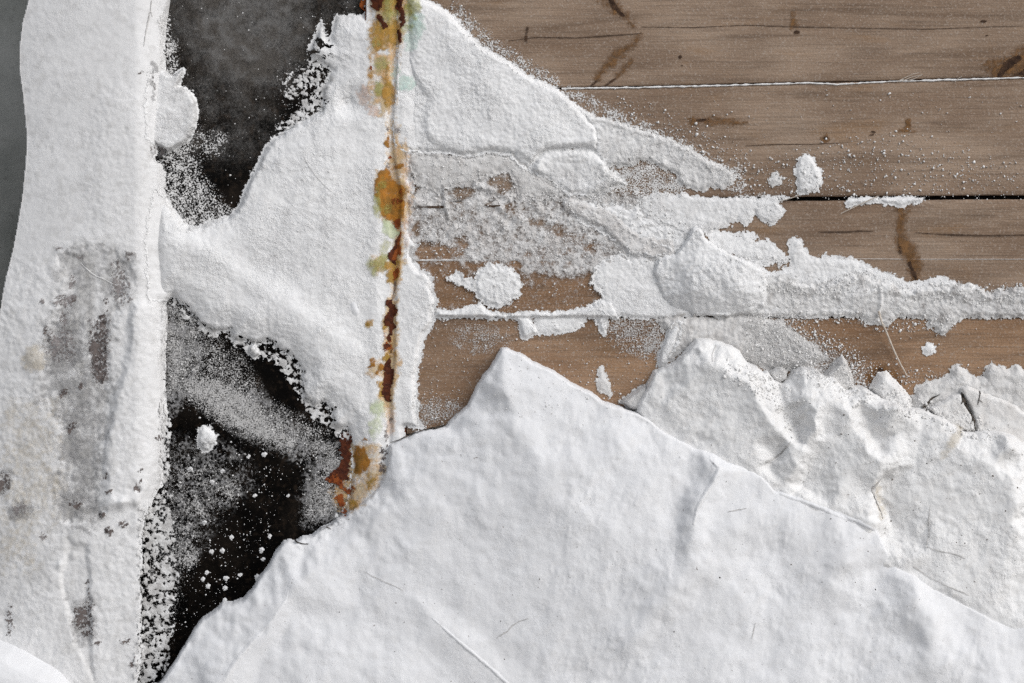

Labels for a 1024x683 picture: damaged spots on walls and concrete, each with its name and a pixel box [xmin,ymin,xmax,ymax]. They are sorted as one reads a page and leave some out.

peeling [143,67,199,153]
corrosion [325,0,422,516]
peeling [247,342,261,360]